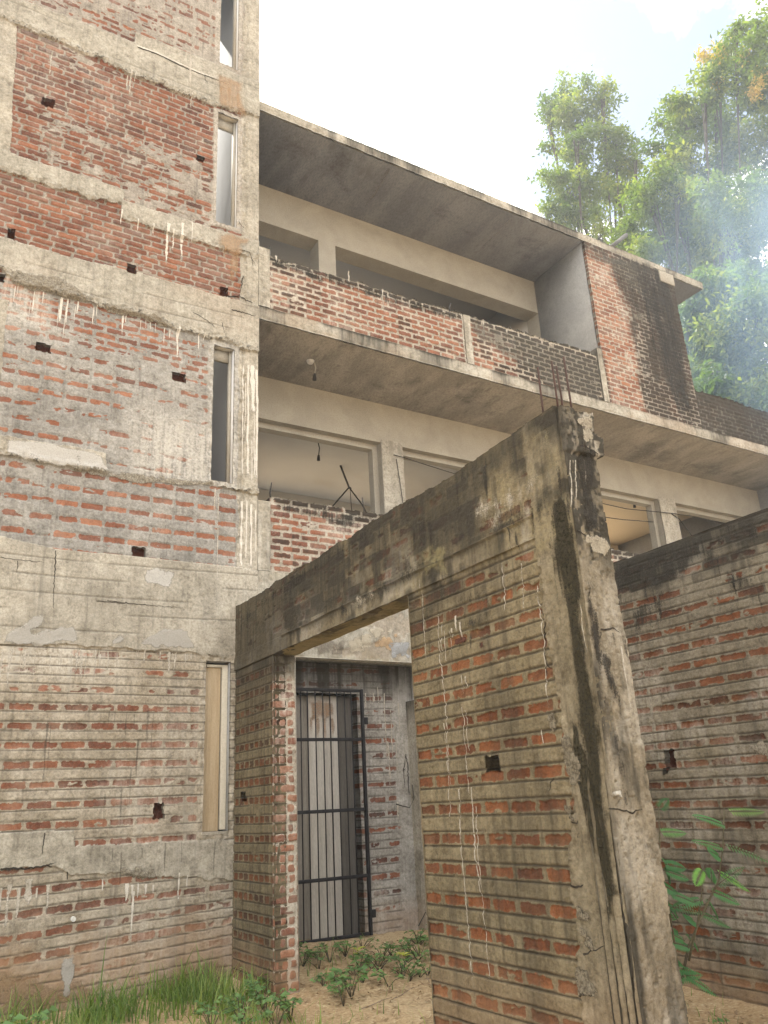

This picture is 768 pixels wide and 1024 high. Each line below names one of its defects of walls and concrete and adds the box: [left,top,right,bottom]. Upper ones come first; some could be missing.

efflorescence [152,222,193,261]
efflorescence [56,297,79,339]
damp [620,261,690,411]
spalling [577,415,593,442]
damp [557,460,586,515]
spalling [585,535,610,557]
crack [0,550,56,609]
damp [419,585,490,976]
crack [609,807,642,815]
crack [0,833,85,880]